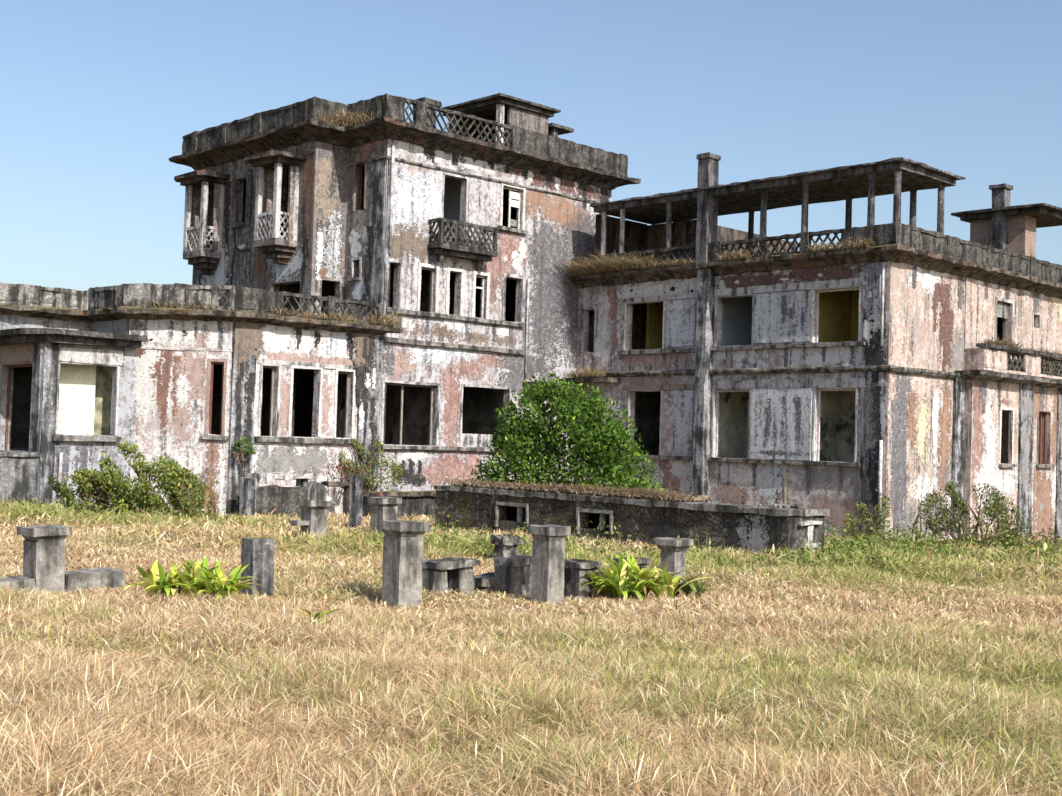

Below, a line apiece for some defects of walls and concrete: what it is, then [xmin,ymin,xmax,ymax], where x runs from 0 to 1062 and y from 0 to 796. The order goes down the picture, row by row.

peeling [292,248,303,269]
peeling [315,157,342,280]
peeling [349,224,368,258]
peeling [351,278,366,300]
damp [424,147,529,180]
damp [395,183,611,395]
damp [949,275,965,372]
peeling [134,320,224,452]
damp [217,321,346,494]
damp [345,333,396,461]
damp [751,328,952,540]
peeling [804,492,859,537]